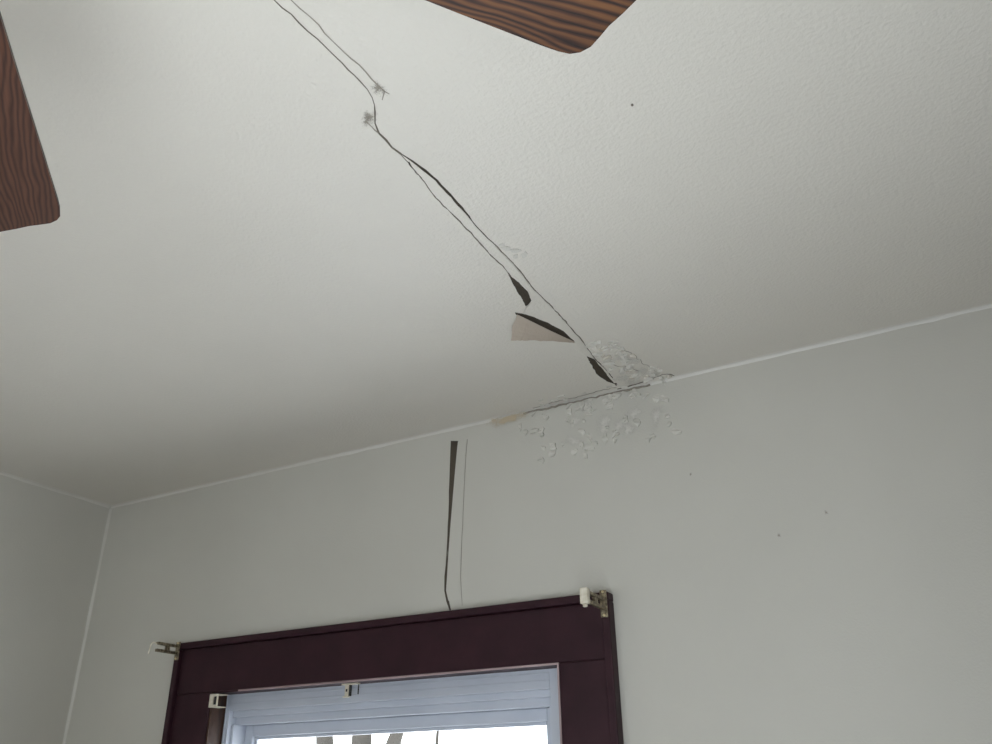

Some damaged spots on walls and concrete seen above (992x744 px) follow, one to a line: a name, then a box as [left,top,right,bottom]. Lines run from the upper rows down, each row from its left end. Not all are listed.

crack [274,0,651,415]
crack [444,439,468,610]